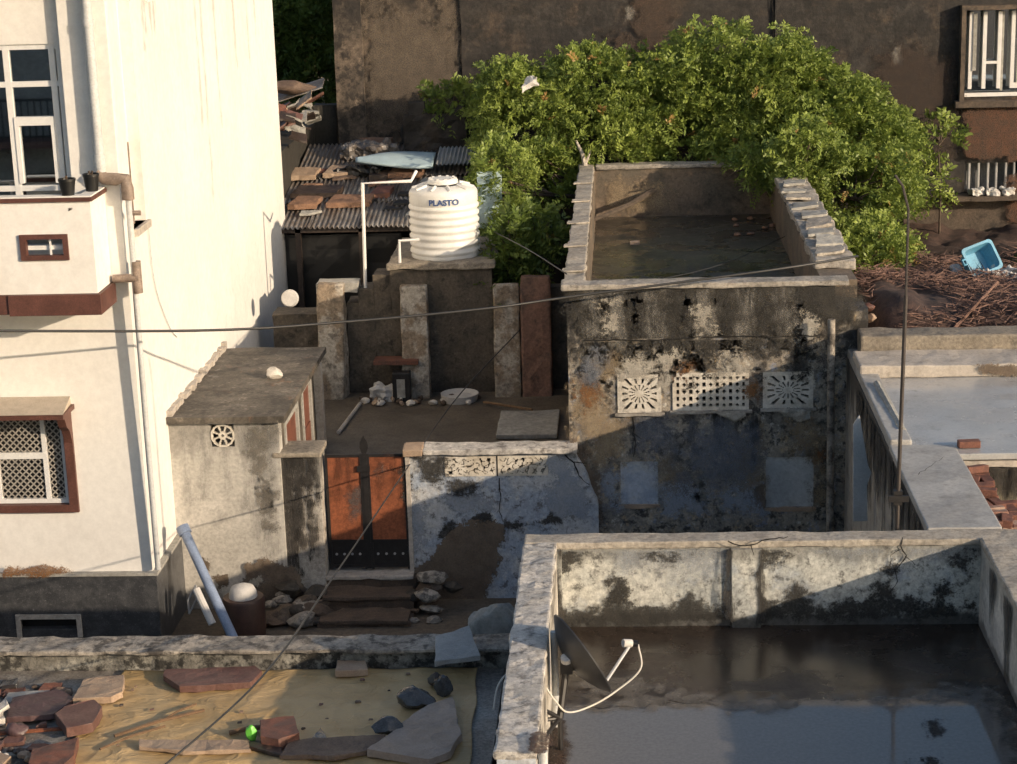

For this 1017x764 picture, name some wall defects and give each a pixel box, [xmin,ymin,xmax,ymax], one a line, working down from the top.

flaking render [593,295,622,335]
flaking render [689,302,719,339]
flaking render [711,347,751,379]
flaking render [789,310,821,343]
spalling [834,298,868,532]
water stain [243,423,327,576]
spalling [407,346,694,599]
water stain [756,549,976,626]
crack [887,537,915,593]
water stain [948,548,1011,682]